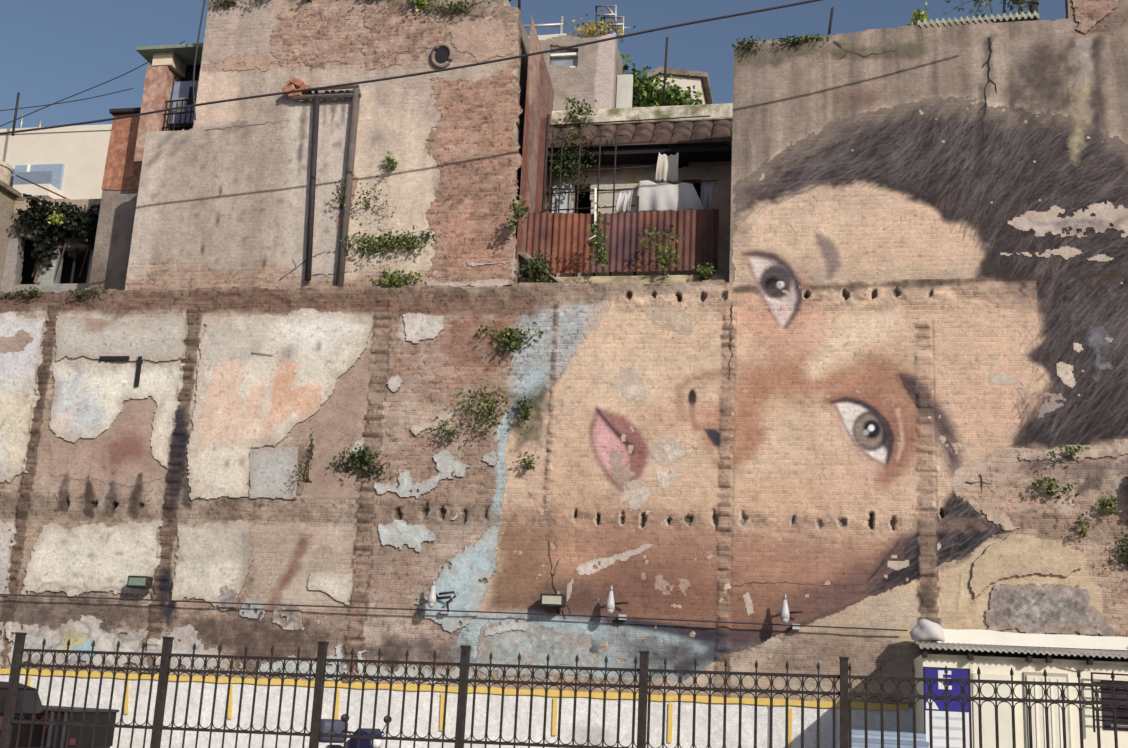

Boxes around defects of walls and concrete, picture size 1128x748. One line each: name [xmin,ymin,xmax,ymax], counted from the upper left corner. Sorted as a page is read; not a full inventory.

crack [978,37,997,142]
flaking render [222,2,523,287]
peeling [1000,201,1128,262]
peeling [0,308,376,500]
water stain [60,480,69,510]
water stain [85,473,142,517]
water stain [168,409,191,506]
peeling [0,615,243,678]
peeling [0,519,305,631]
water stain [159,570,174,622]
flaking render [258,526,599,685]
flaking render [984,583,1113,636]